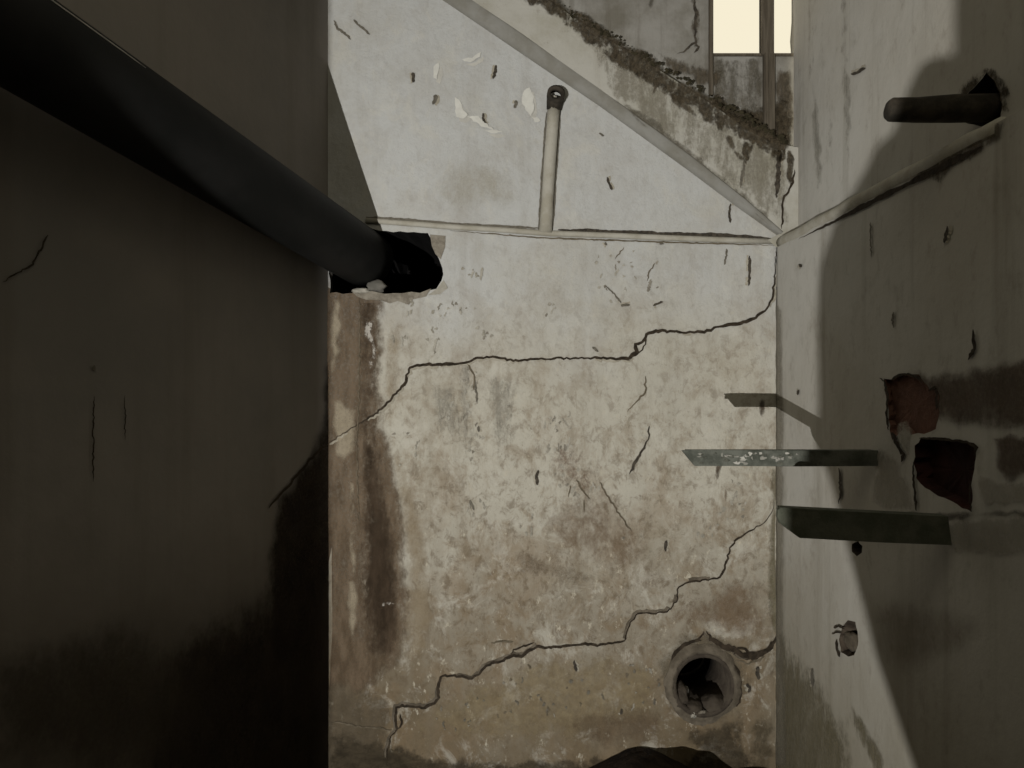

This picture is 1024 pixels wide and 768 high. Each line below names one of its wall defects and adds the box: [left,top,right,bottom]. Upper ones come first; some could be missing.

peeling [455,97,494,130]
peeling [462,52,497,79]
peeling [512,87,541,122]
damp [527,0,794,216]
spalling [968,73,999,94]
spalling [329,229,448,305]
crack [269,254,777,508]
flaking render [880,373,978,512]
damp [155,287,603,768]
crack [568,480,631,530]
crack [384,507,776,765]
spalling [832,620,858,657]